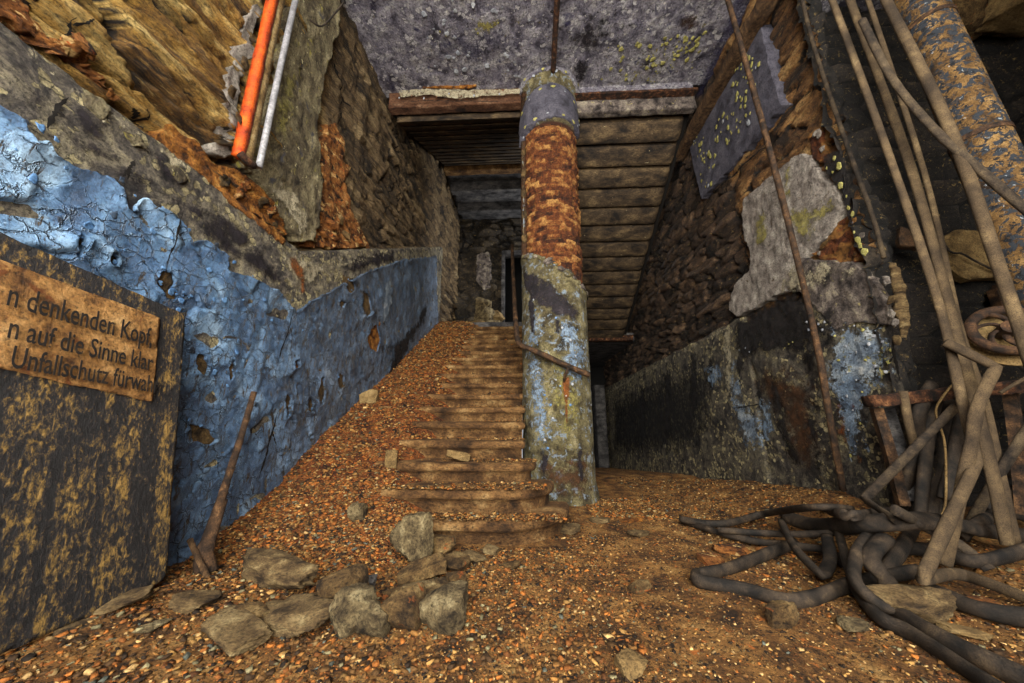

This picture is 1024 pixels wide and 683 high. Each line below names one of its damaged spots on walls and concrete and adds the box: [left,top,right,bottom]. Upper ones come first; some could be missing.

flaking render [227,85,242,125]
crack [123,160,136,180]
spalling [806,128,868,263]
crack [163,213,185,276]
peeling [0,105,439,566]